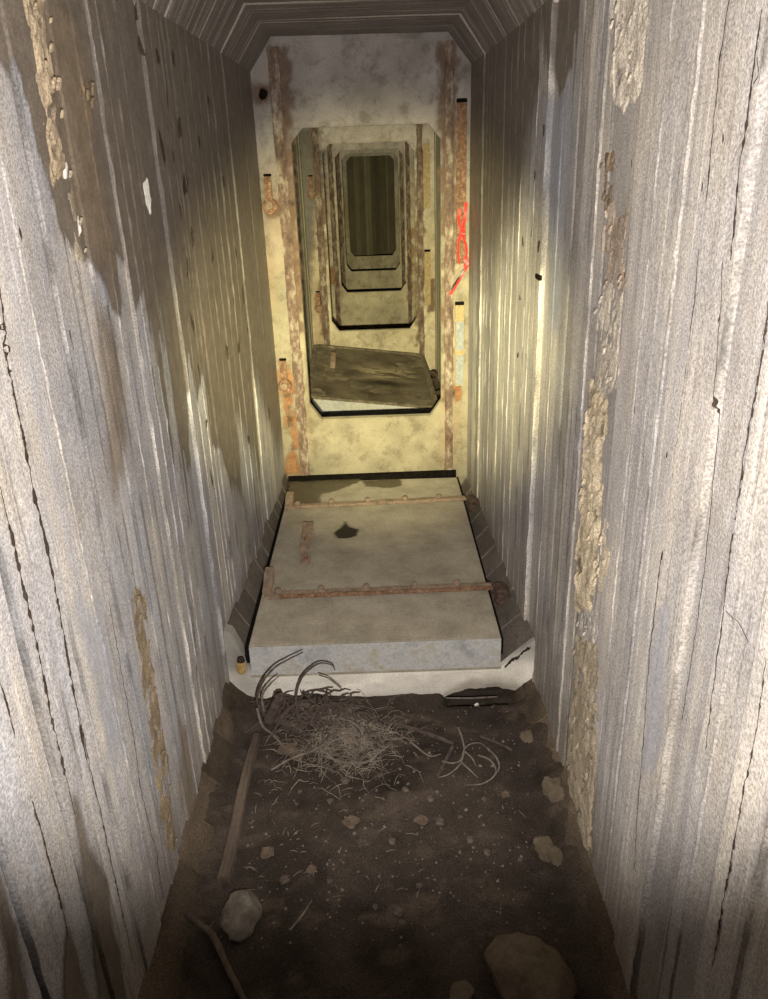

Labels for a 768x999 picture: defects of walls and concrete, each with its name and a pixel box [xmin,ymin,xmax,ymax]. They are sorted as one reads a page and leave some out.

spalling [23,0,88,267]
rust [254,49,303,332]
rust [407,43,459,348]
spalling [608,0,649,115]
crack [0,289,133,960]
rust [279,371,300,473]
leakage [335,524,358,538]
spalling [542,150,629,855]
crack [682,0,768,750]
crack [712,662,766,965]